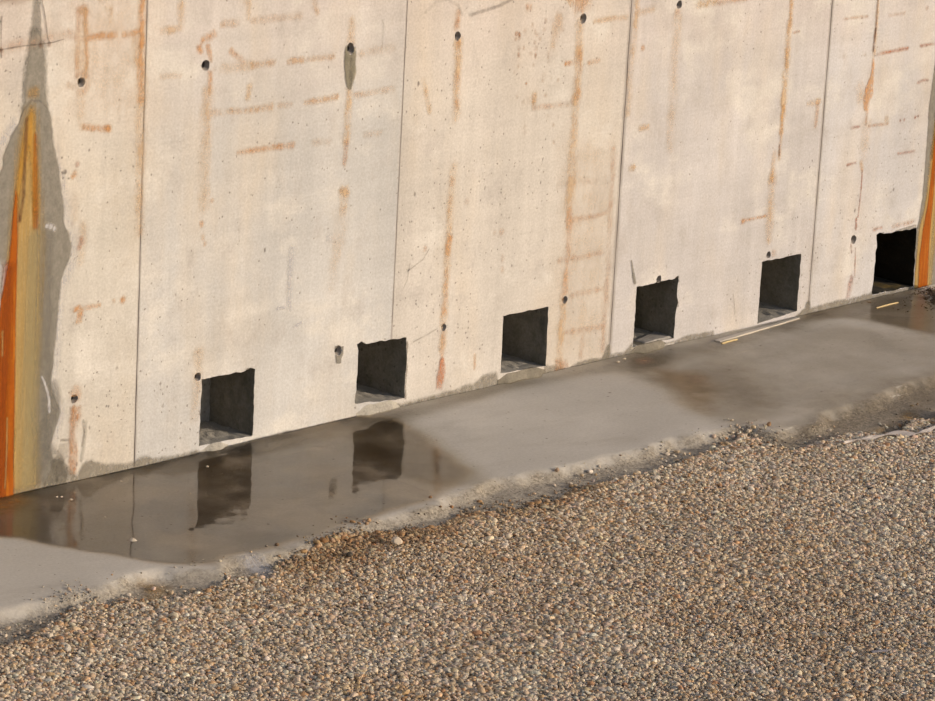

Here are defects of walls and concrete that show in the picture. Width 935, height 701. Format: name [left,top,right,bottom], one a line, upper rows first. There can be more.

rust [0,110,40,499]
damp [0,29,200,495]
rust [914,126,935,289]